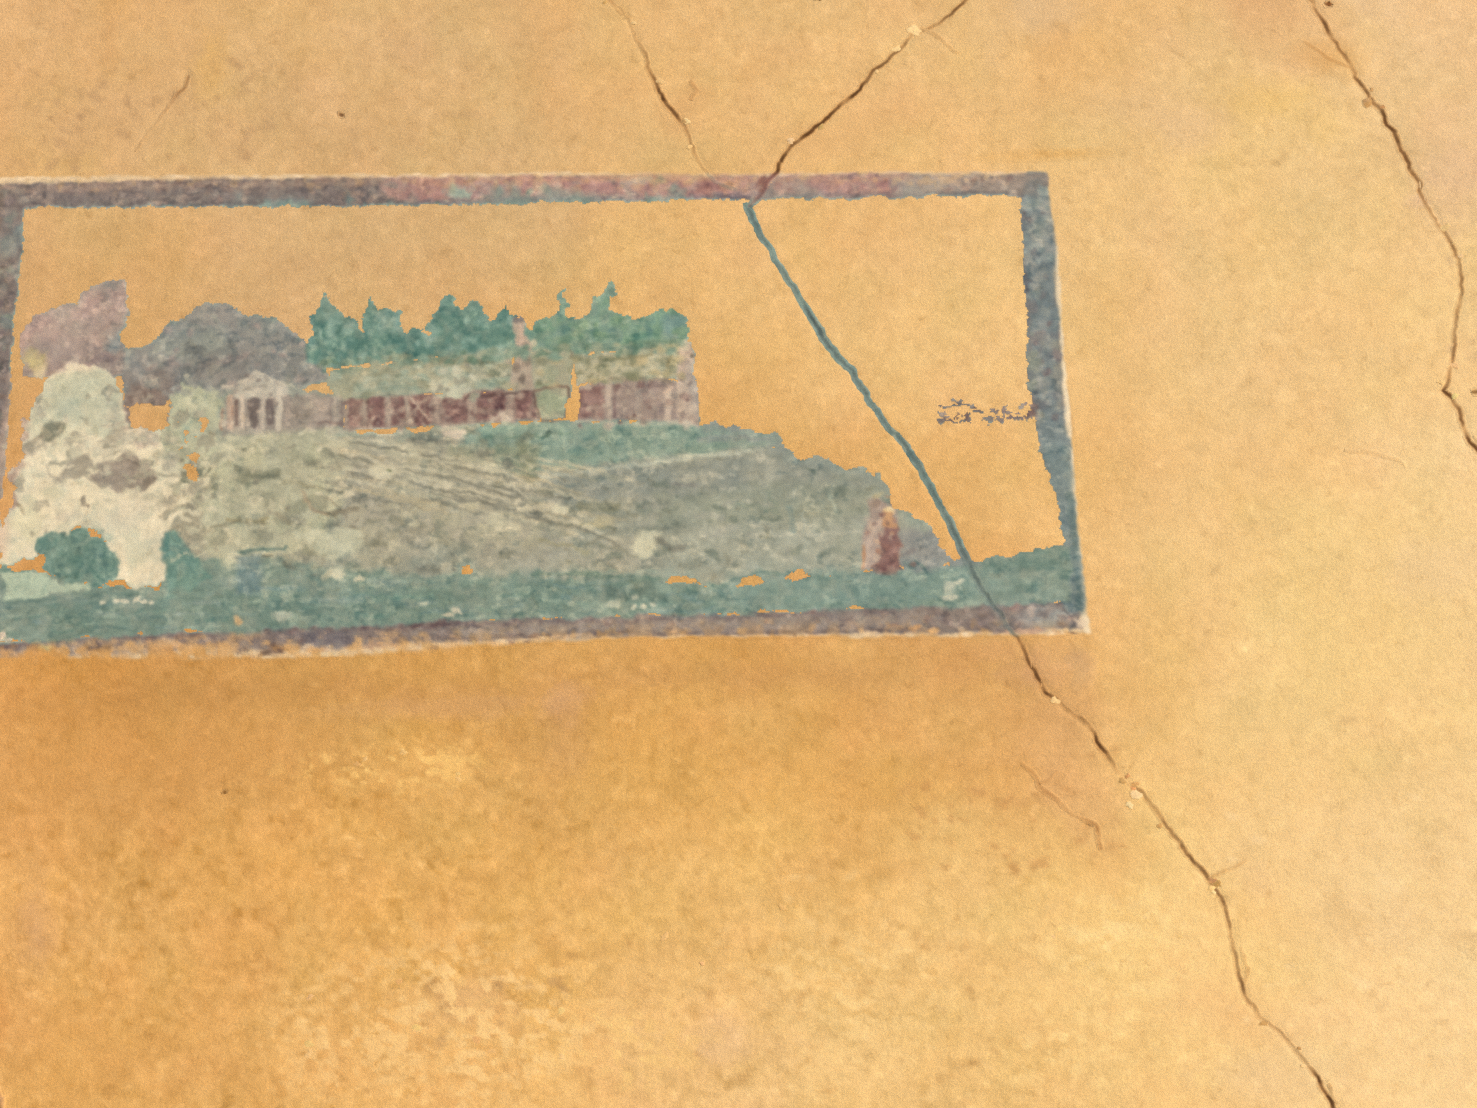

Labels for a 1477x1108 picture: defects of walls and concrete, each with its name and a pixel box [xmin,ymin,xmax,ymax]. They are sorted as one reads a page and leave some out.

crack [603,0,1339,1108]
crack [1303,0,1477,455]